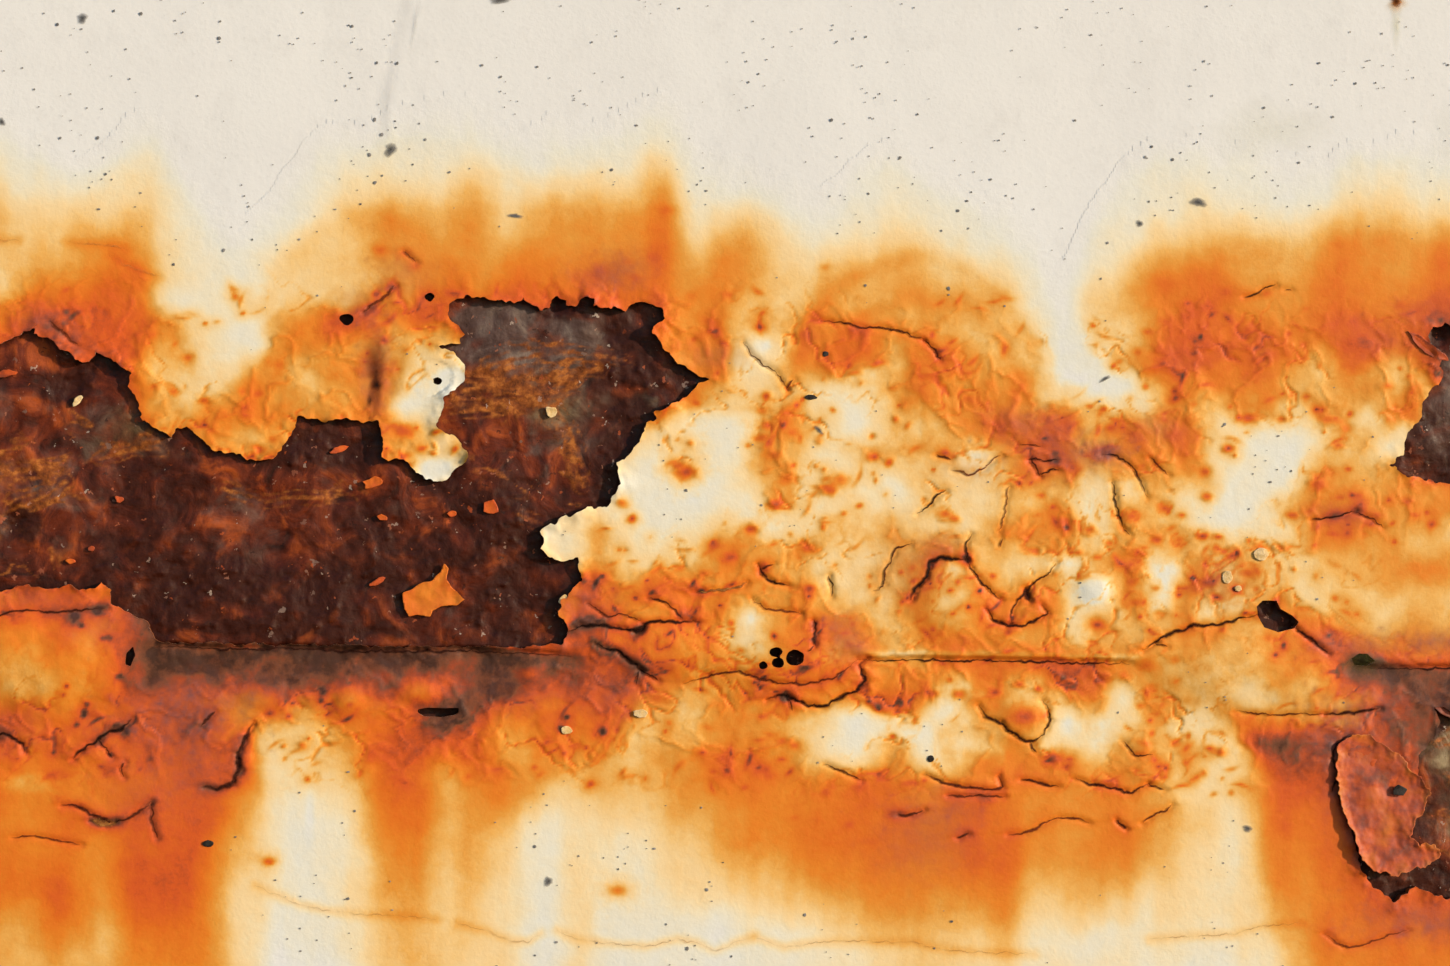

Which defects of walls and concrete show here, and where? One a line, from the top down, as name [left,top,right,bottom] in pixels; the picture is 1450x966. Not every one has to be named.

crack [830,321,940,358]
crack [747,347,793,388]
crack [1106,454,1167,534]
corrosion [0,105,1280,966]
crack [1149,616,1253,646]
crack [1296,628,1328,653]
crack [0,732,25,750]
crack [75,722,129,776]
crack [209,727,251,791]
crack [928,704,1171,835]
crack [17,804,158,844]
peeling [1335,734,1441,877]